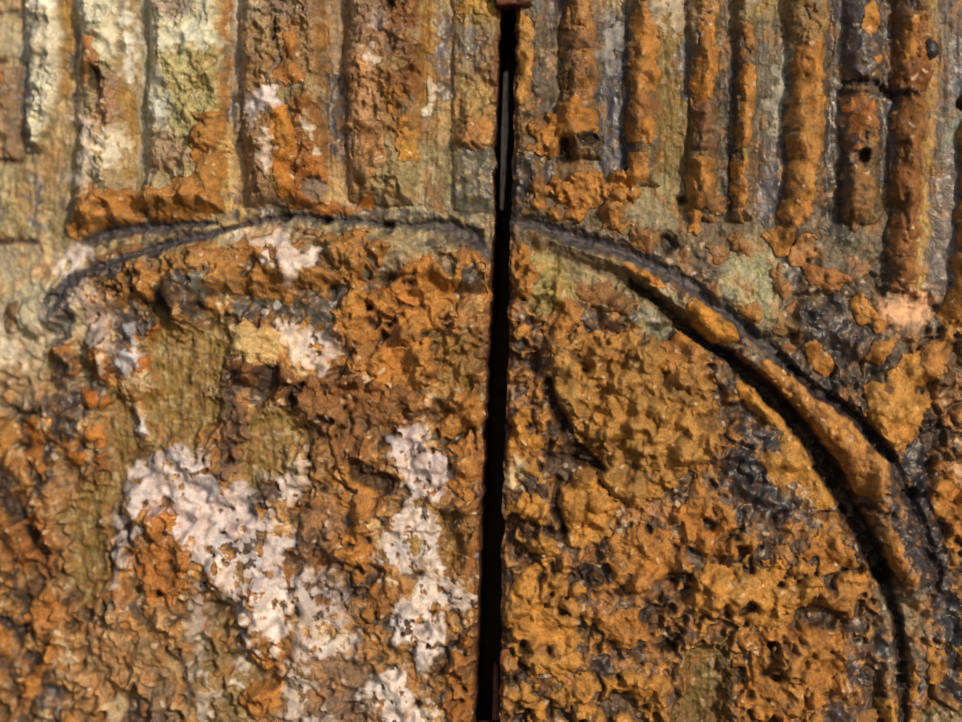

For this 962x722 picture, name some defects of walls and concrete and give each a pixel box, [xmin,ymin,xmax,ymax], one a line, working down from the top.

rust [0,500,61,699]
rust [65,110,234,241]
water stain [104,404,376,722]
water stain [0,73,497,502]
rust [89,227,492,636]
water stain [353,419,478,722]
rust [514,11,535,110]
rust [522,0,664,255]
rust [501,241,889,722]
rust [684,0,758,266]
rust [760,0,962,450]
rust [928,468,962,602]